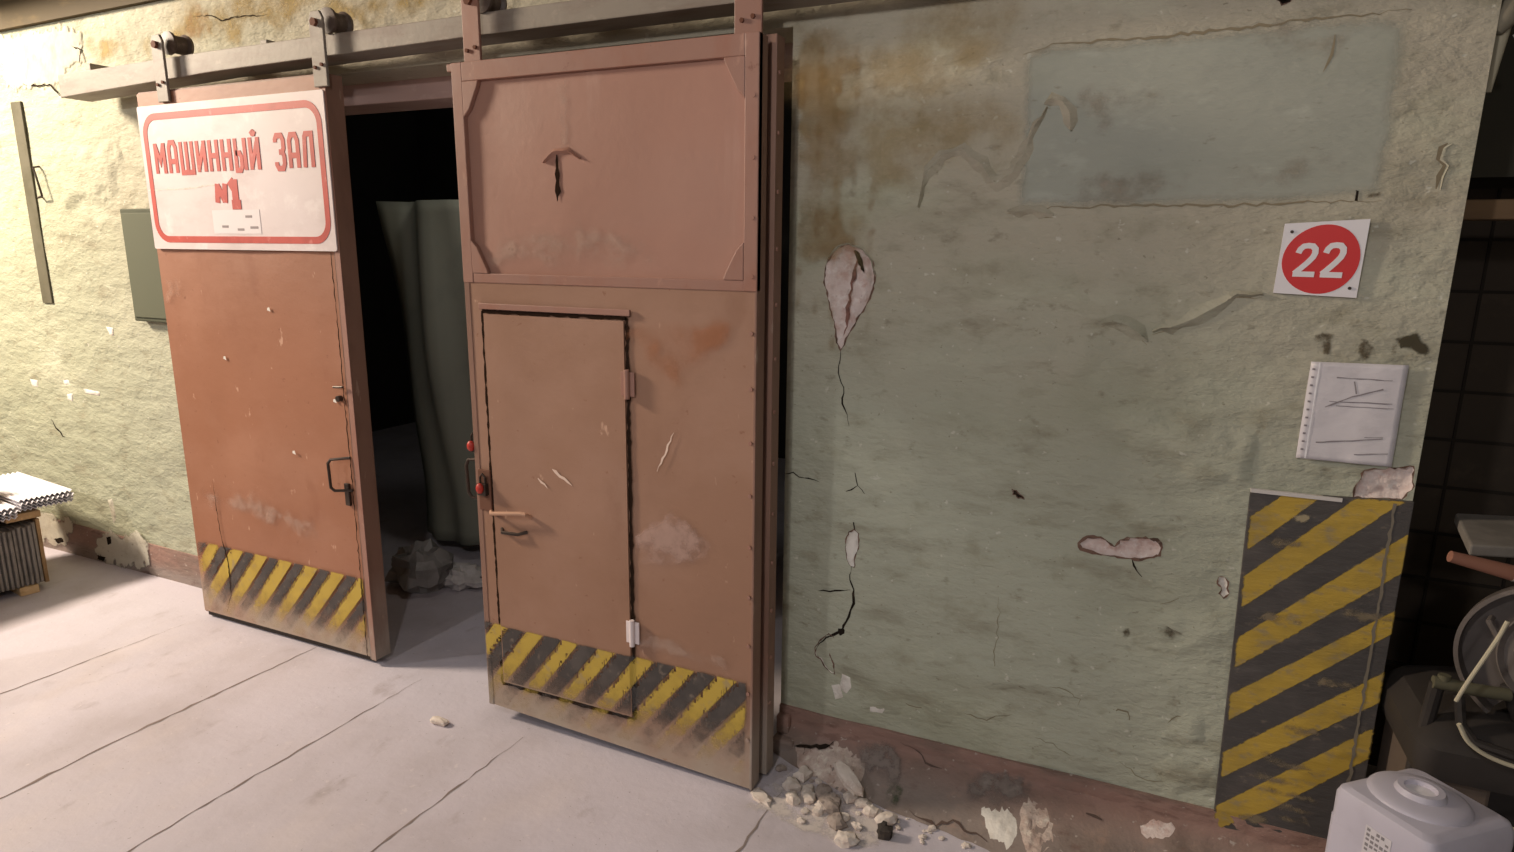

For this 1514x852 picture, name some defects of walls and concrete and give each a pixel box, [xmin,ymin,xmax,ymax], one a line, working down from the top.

flaking render [823,243,876,424]
flaking render [1353,466,1415,500]
flaking render [1077,535,1163,577]
crack [786,472,922,713]
spalling [795,741,865,792]
crack [910,811,987,842]
spalling [981,797,1053,852]